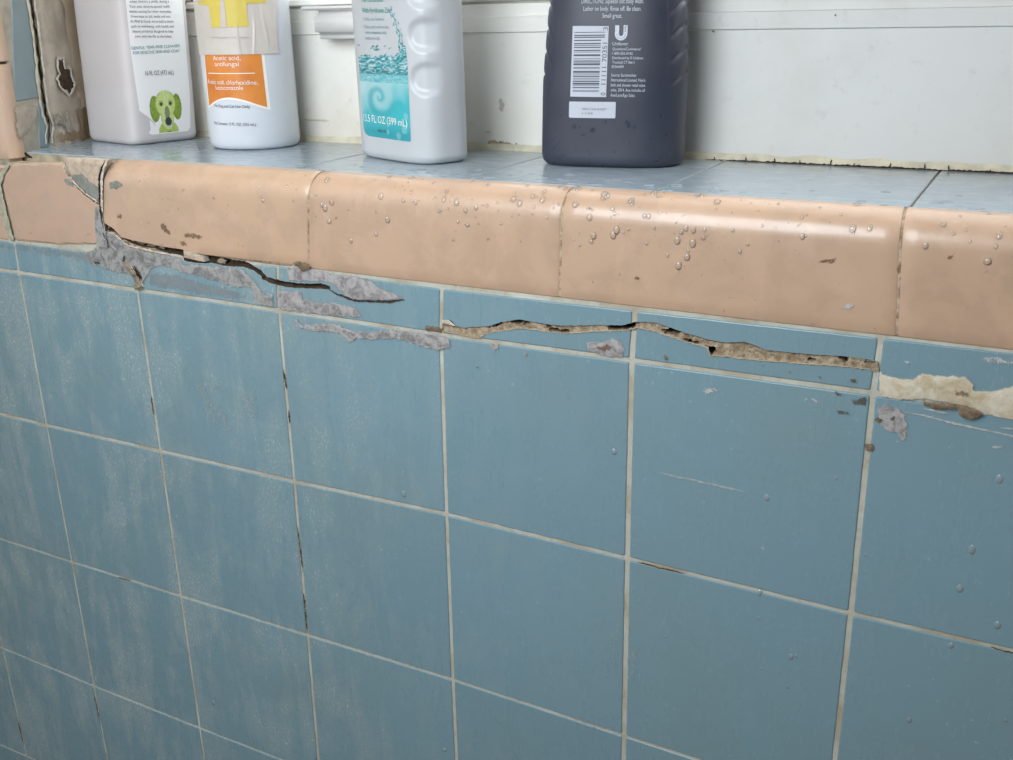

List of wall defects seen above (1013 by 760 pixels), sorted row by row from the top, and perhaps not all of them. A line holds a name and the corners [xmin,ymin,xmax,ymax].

crack [26,0,404,303]
peeling [64,174,122,200]
crack [425,319,879,371]
spalling [879,372,1013,420]